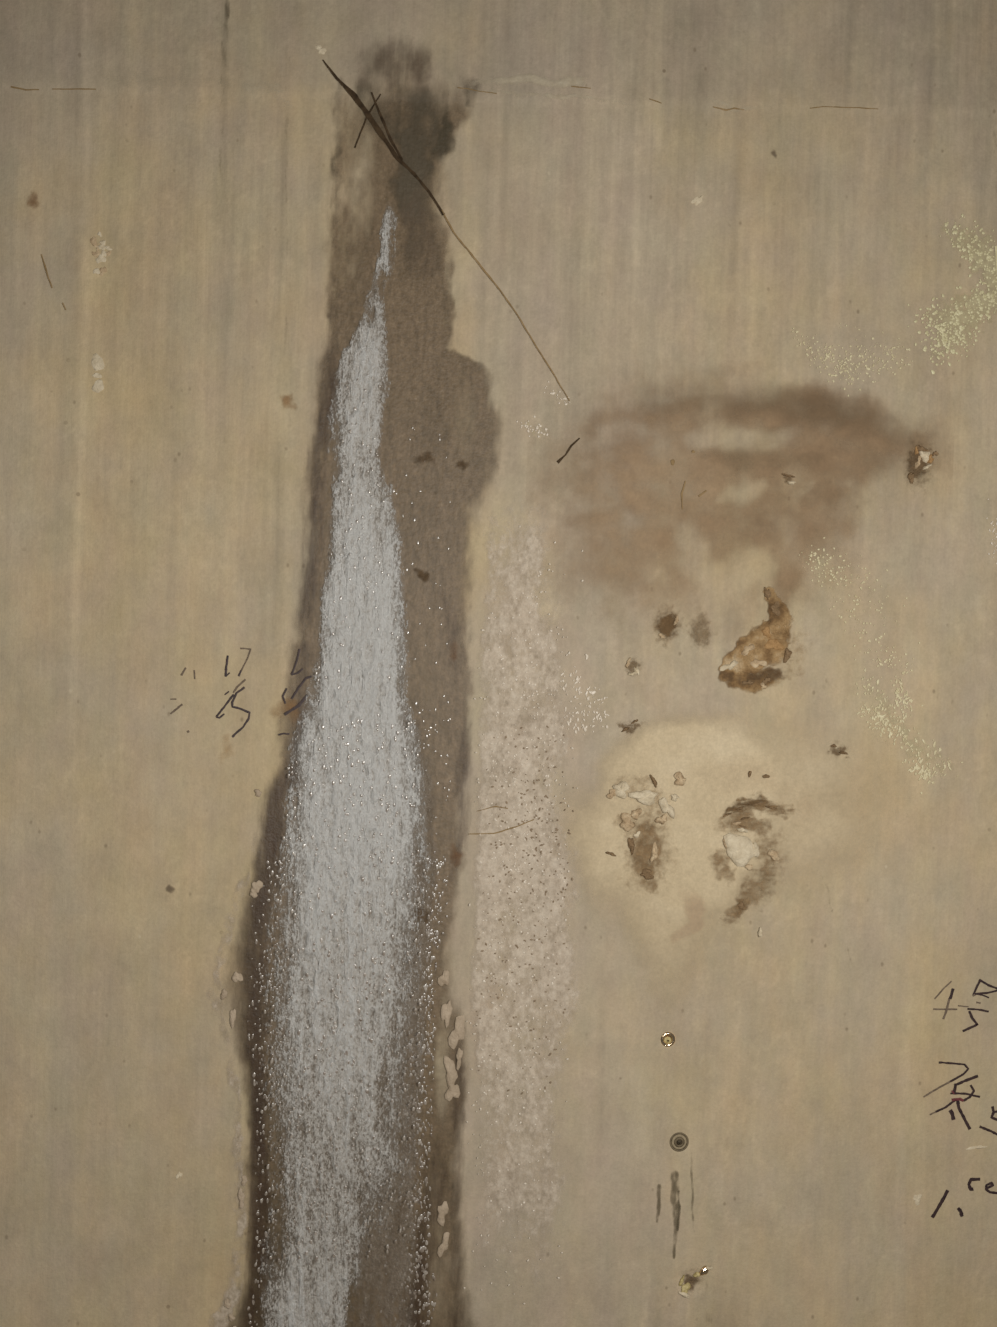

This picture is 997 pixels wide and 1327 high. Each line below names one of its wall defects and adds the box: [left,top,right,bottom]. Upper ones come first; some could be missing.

leakage [581,389,926,600]
leakage [214,53,587,1327]
spalling [719,587,792,693]
spalling [606,771,686,890]
spalling [714,795,793,918]